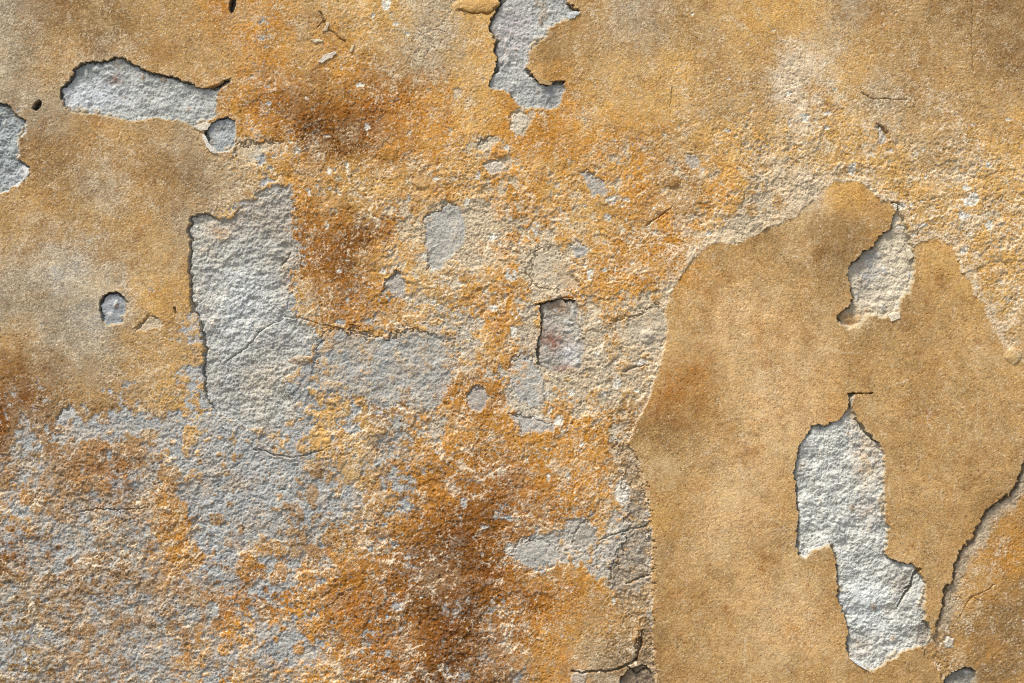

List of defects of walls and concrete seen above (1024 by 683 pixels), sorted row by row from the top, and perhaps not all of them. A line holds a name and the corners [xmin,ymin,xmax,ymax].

spalling [0,99,42,194]
spalling [60,56,287,166]
spalling [476,0,581,175]
spalling [98,291,165,333]
peeling [185,182,467,433]
spalling [504,239,591,437]
spalling [836,206,917,331]
spalling [792,393,1024,683]
crack [570,629,650,675]
crack [959,584,996,618]